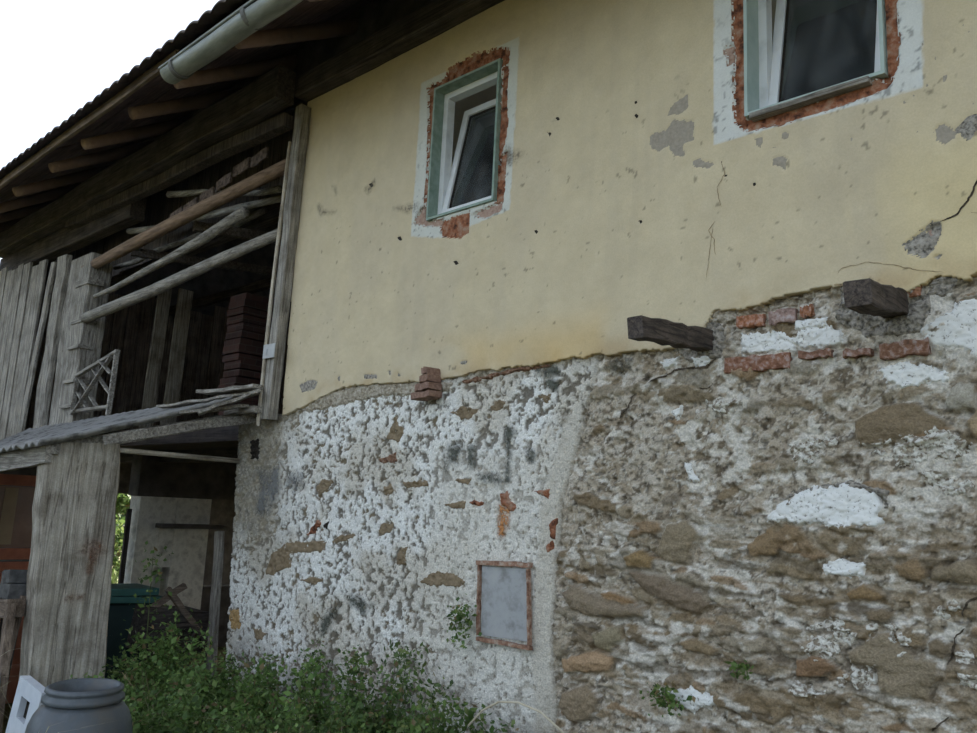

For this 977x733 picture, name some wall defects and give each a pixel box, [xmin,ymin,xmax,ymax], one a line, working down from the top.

peeling [650,94,722,169]
spalling [414,201,504,239]
spalling [902,220,942,260]
crack [942,180,977,221]
flaking render [660,276,977,389]
peeling [859,425,975,497]
peeling [767,480,885,529]
spalling [546,518,558,552]
peeling [822,558,866,579]
peeling [800,617,912,662]
peeling [668,685,715,714]
peeling [788,660,878,698]